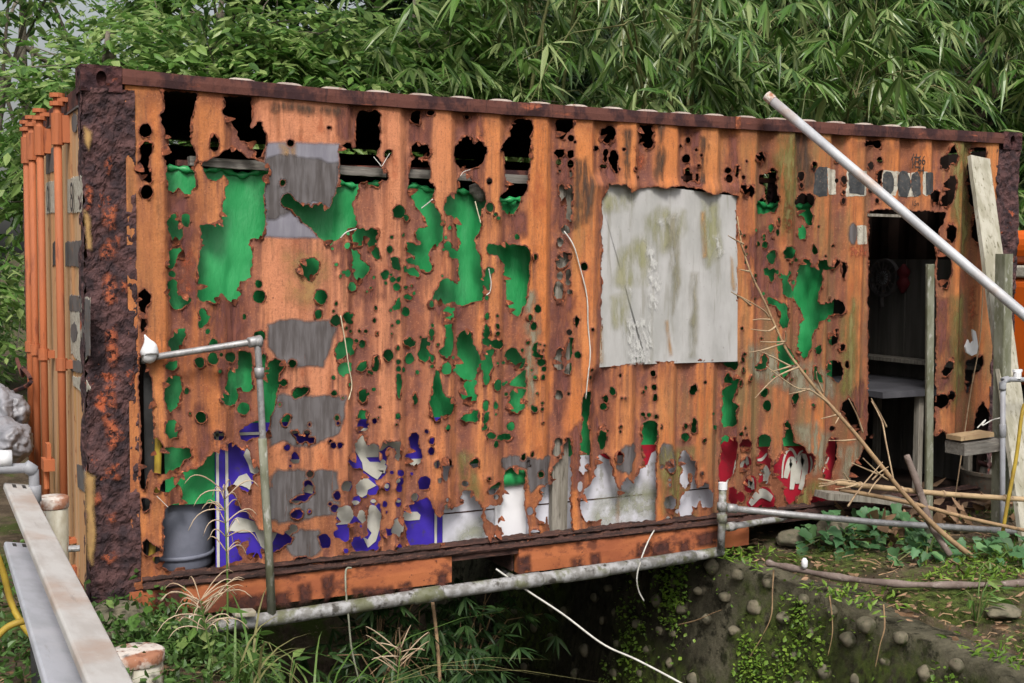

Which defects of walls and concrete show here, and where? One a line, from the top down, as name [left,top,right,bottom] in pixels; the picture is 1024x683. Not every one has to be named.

rust [101,206,119,257]
rust [654,129,884,397]
rust [104,274,151,332]
rust [106,328,118,365]
rust [137,106,677,554]
peeling [383,439,417,469]
rust [656,360,869,520]
rust [518,555,531,574]
rust [572,554,600,567]
rust [637,530,718,556]